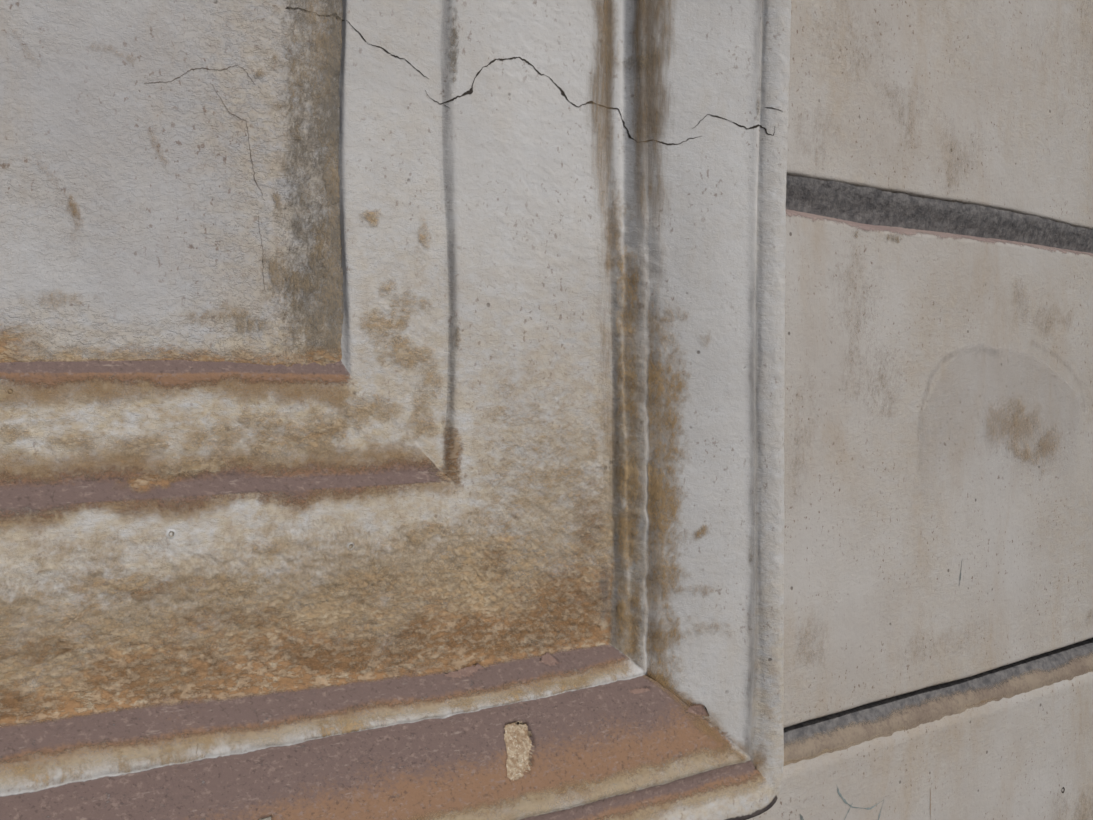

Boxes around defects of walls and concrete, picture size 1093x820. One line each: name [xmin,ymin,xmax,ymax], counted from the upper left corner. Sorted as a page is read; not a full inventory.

crack [285,7,783,145]
damp [593,0,613,142]
damp [628,0,667,159]
crack [151,65,265,290]
damp [0,428,462,514]
damp [646,355,691,707]
damp [0,660,627,785]
spalling [504,721,534,781]